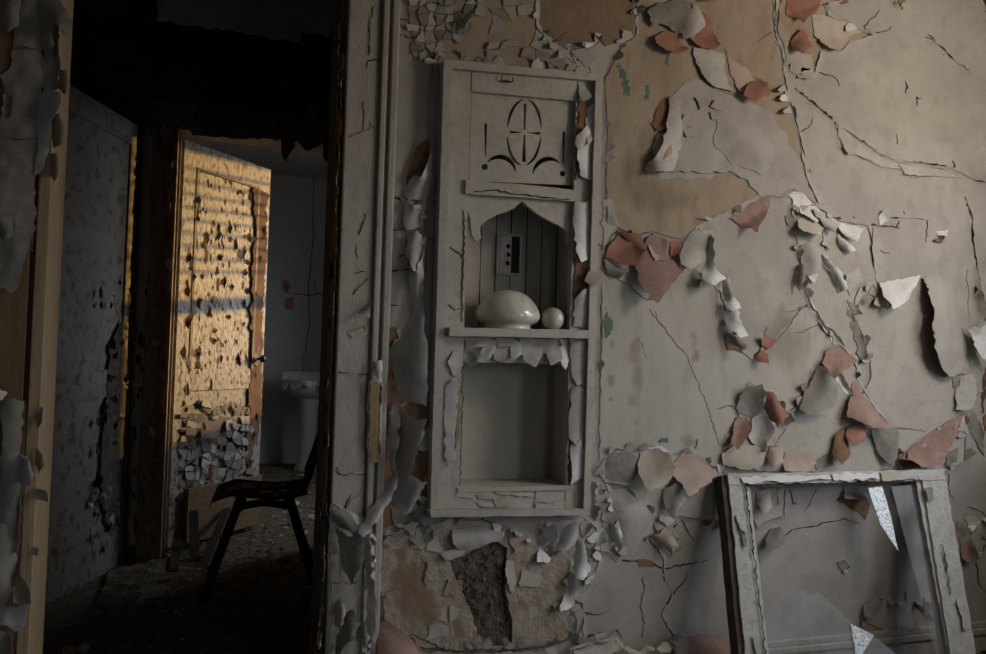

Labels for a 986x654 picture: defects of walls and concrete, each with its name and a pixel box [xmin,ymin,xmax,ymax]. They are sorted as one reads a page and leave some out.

peeling [0,387,49,654]
peeling [0,0,73,293]
peeling [89,279,133,553]
peeling [149,138,176,539]
peeling [177,179,269,489]
peeling [190,107,329,164]
crack [411,518,716,654]
peeling [326,0,986,654]
crack [770,0,986,456]